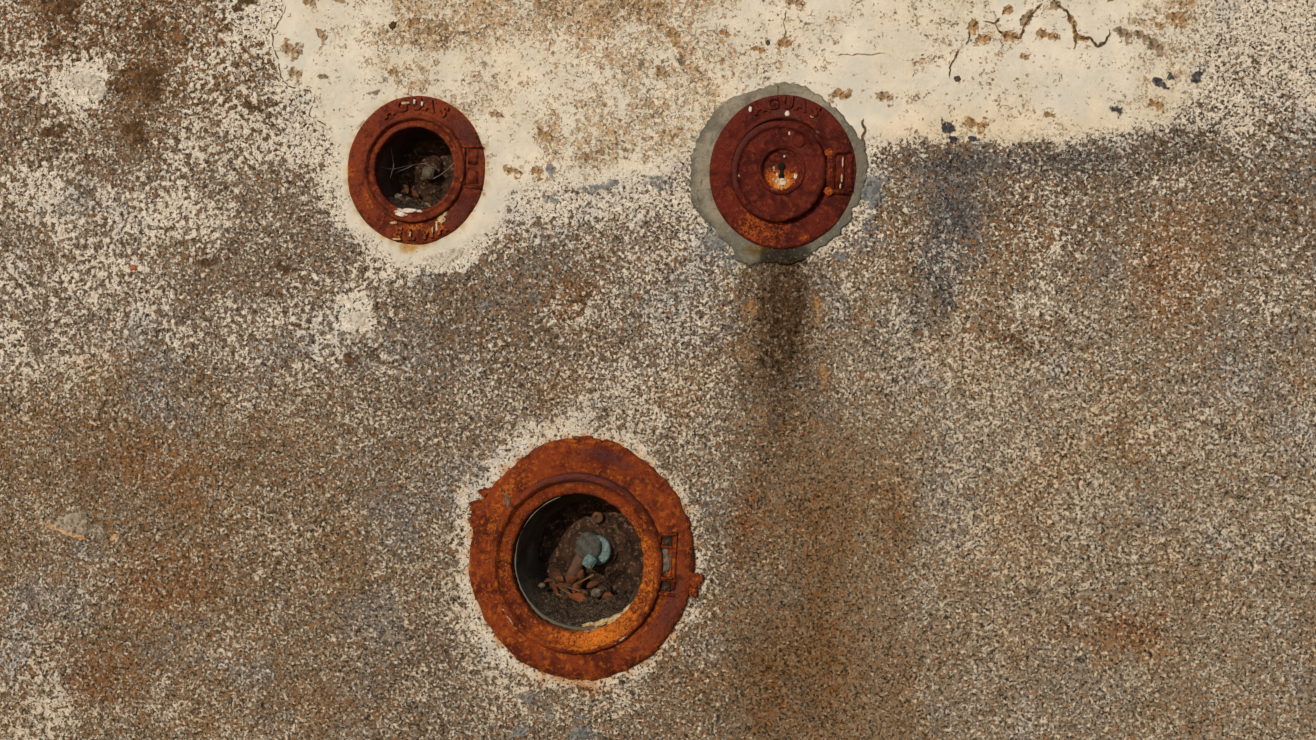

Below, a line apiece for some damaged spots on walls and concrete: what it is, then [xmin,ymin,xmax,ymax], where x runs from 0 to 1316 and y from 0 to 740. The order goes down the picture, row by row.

crack [949,0,1110,79]
damp [941,117,976,144]
rust [823,148,834,196]
damp [736,260,824,423]